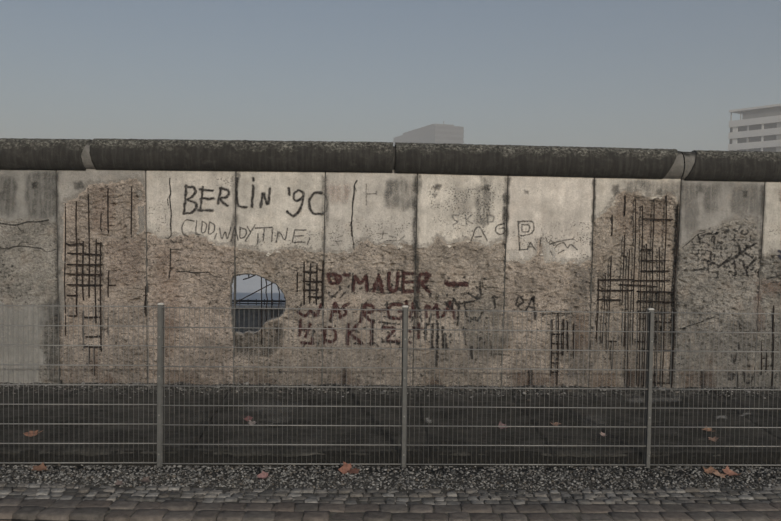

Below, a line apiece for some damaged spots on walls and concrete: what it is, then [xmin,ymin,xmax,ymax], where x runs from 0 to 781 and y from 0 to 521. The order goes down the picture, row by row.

crack [0,219,56,252]
spalling [0,178,781,389]